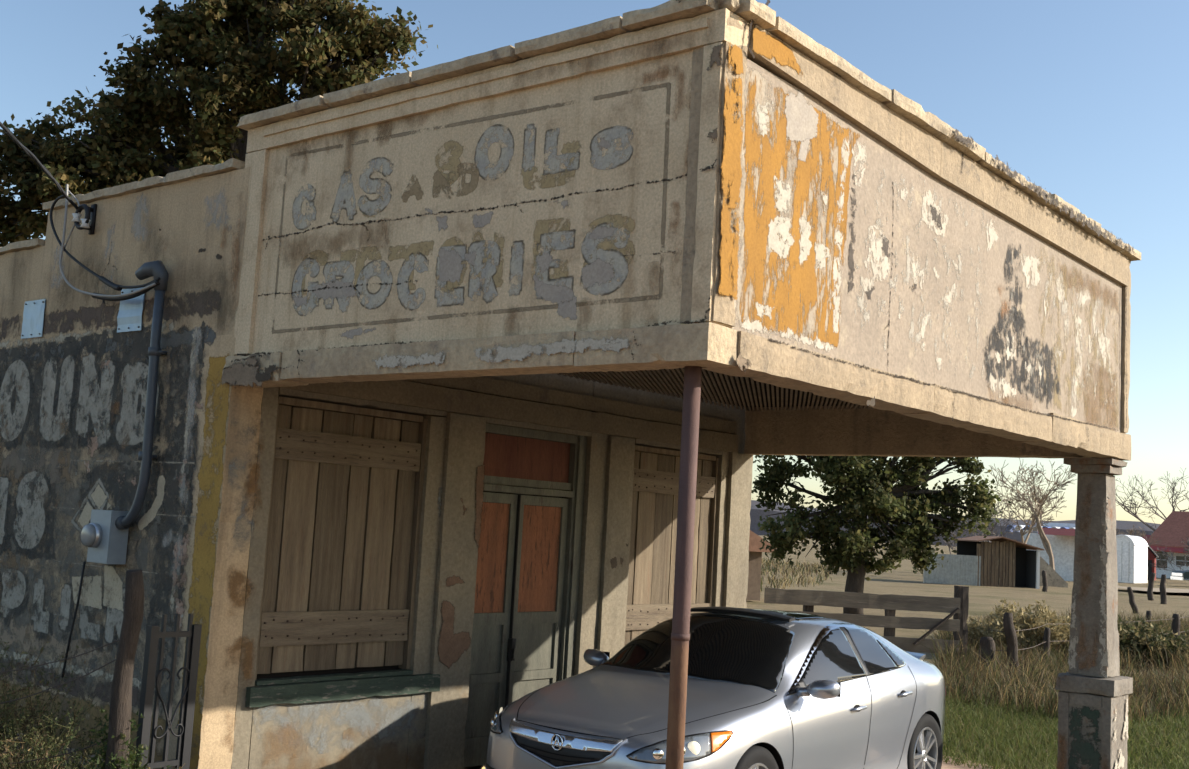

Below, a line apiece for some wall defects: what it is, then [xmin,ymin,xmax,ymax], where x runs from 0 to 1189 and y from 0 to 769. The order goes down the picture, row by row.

crack [263,159,717,249]
peeling [707,28,1134,427]
spalling [221,354,276,389]
peeling [373,351,445,369]
peeling [475,336,630,363]